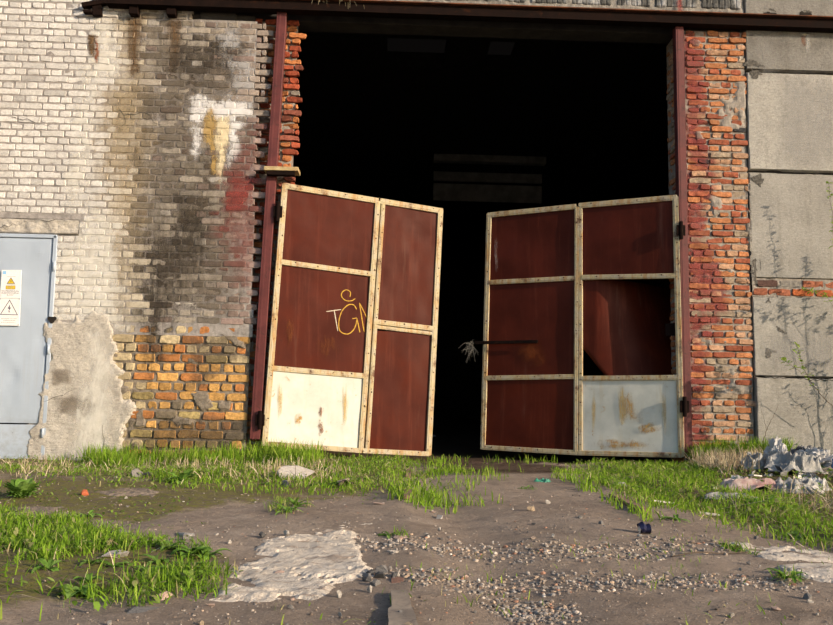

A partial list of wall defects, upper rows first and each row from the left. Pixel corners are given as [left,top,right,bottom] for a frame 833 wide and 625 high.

corrosion [88,35,99,63]
leakage [167,21,181,71]
leakage [190,94,253,176]
leakage [173,197,210,259]
leakage [142,253,167,363]
peeling [26,311,146,460]
peeling [191,391,213,412]